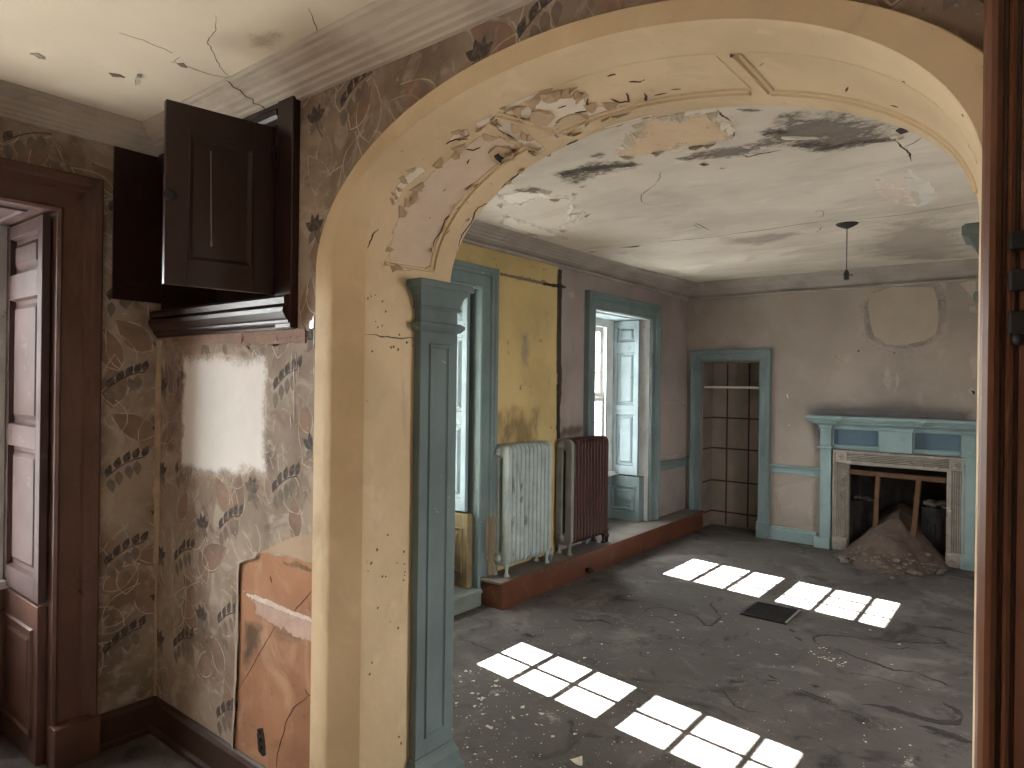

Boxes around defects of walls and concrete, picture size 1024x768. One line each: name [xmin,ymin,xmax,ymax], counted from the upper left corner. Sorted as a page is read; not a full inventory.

crack [121,17,265,109]
peeling [385,87,737,272]
leakage [678,112,893,169]
crack [894,137,922,160]
crack [365,332,415,340]
flaking render [234,533,313,768]
crack [239,591,312,689]
crack [276,689,310,767]